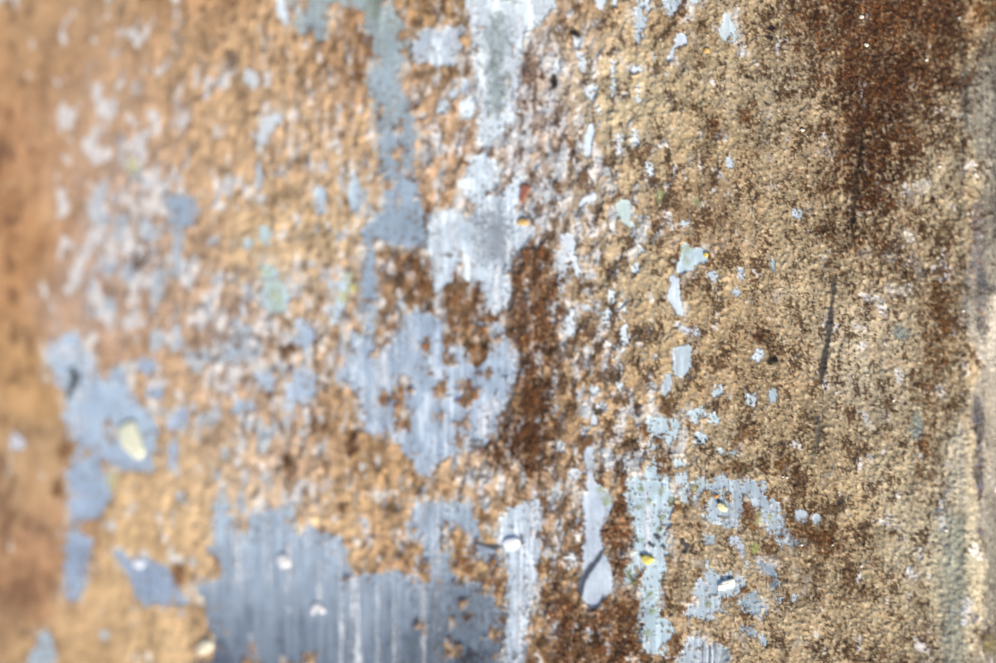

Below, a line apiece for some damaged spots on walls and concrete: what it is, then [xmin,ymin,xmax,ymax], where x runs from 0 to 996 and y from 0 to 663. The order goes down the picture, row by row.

peeling [633,0,682,44]
peeling [667,33,687,61]
peeling [718,13,742,44]
corrosion [771,0,996,279]
peeling [277,0,557,480]
peeling [560,309,576,337]
peeling [555,233,583,294]
peeling [661,243,708,396]
damp [977,268,996,384]
peeling [44,329,191,606]
peeling [112,491,544,663]
peeling [579,411,821,663]